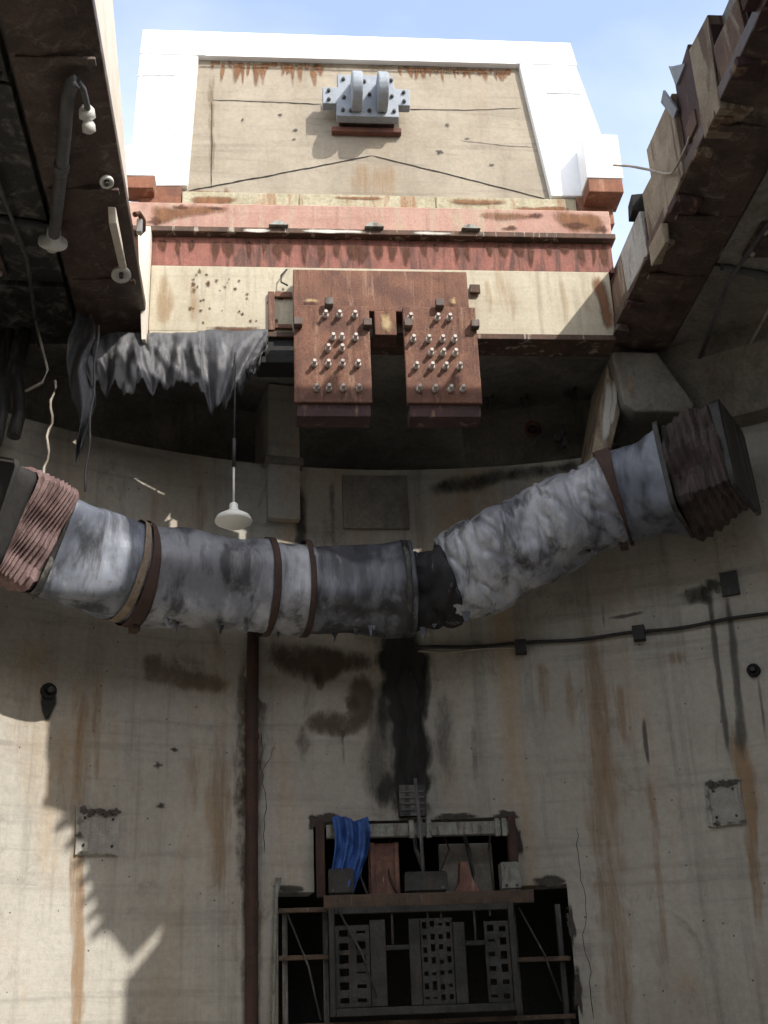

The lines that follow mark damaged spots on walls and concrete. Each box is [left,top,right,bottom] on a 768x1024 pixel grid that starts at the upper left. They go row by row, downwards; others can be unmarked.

rust [211,61,323,84]
rust [454,199,607,233]
rust [547,247,608,264]
leakage [272,635,431,811]
leakage [685,580,746,749]
crack [576,828,594,1018]